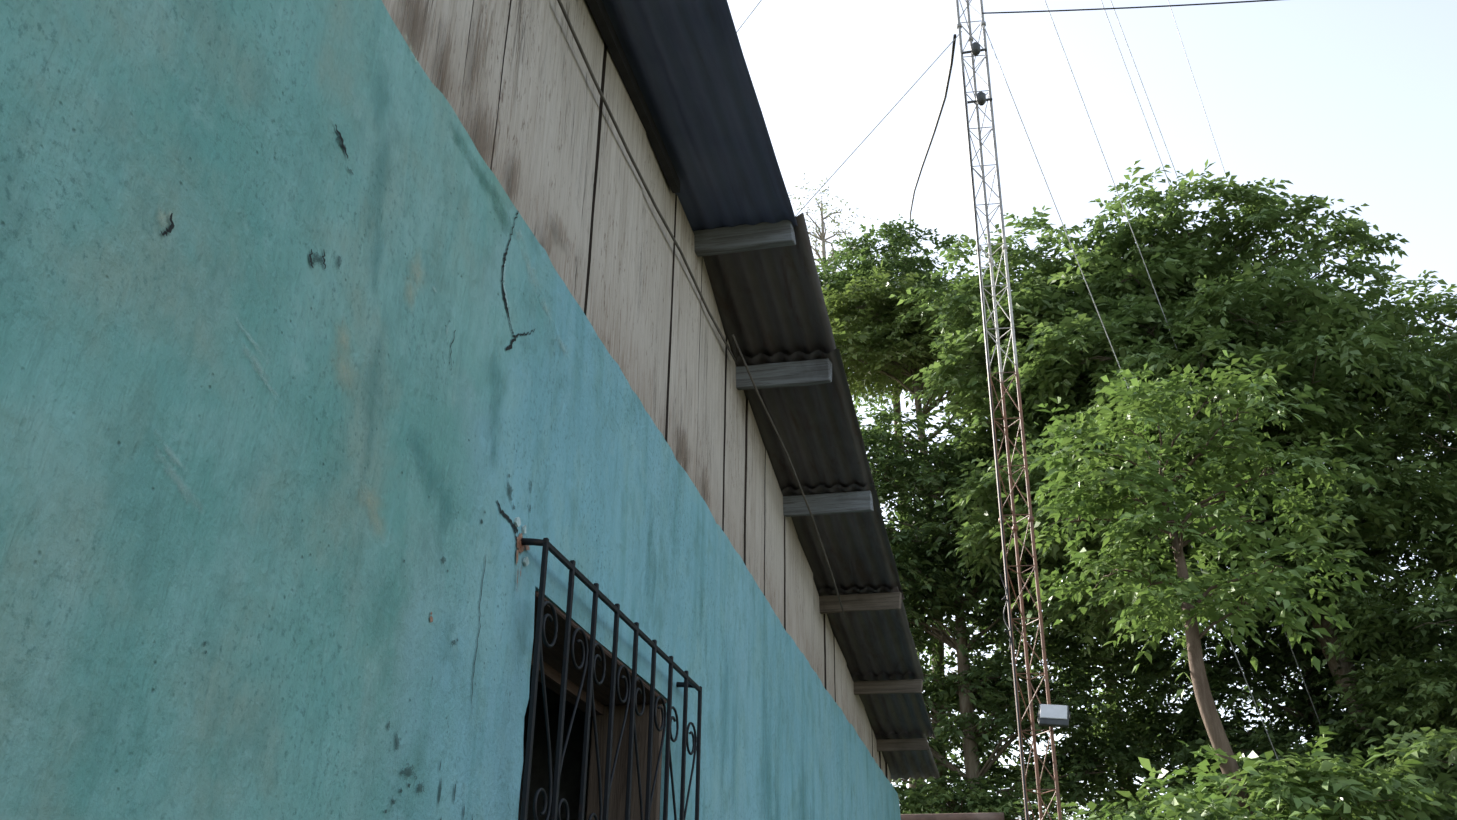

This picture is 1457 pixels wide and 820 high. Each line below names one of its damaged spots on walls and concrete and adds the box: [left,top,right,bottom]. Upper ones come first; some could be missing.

crack [501,211,535,351]
water stain [385,762,473,820]